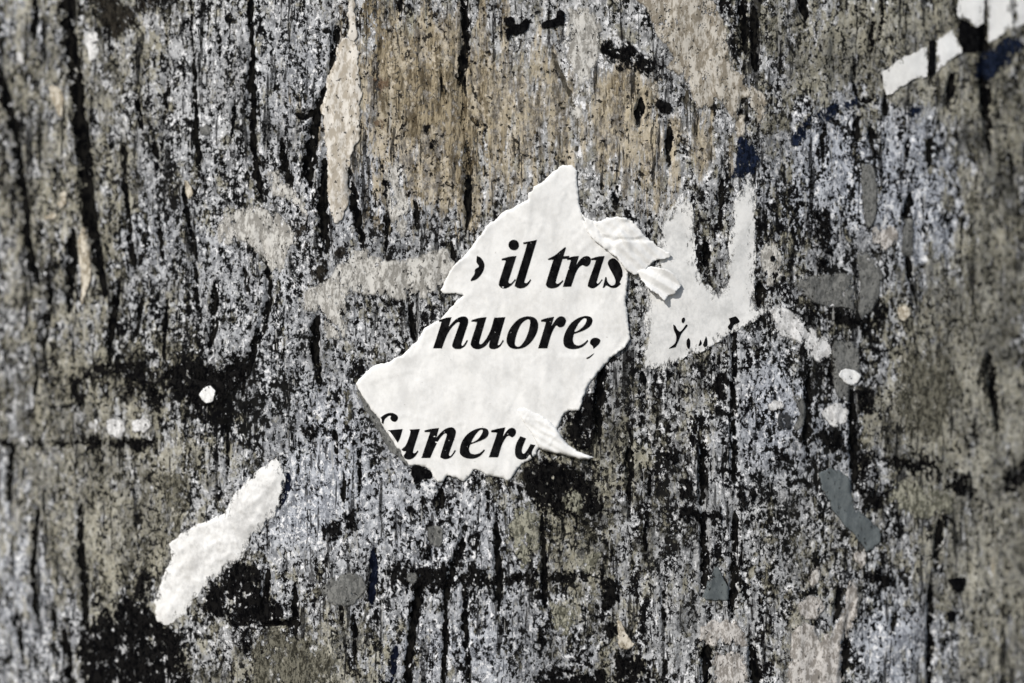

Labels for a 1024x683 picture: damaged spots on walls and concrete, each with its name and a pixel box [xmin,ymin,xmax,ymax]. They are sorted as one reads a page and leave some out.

peeling [384,161,409,238]